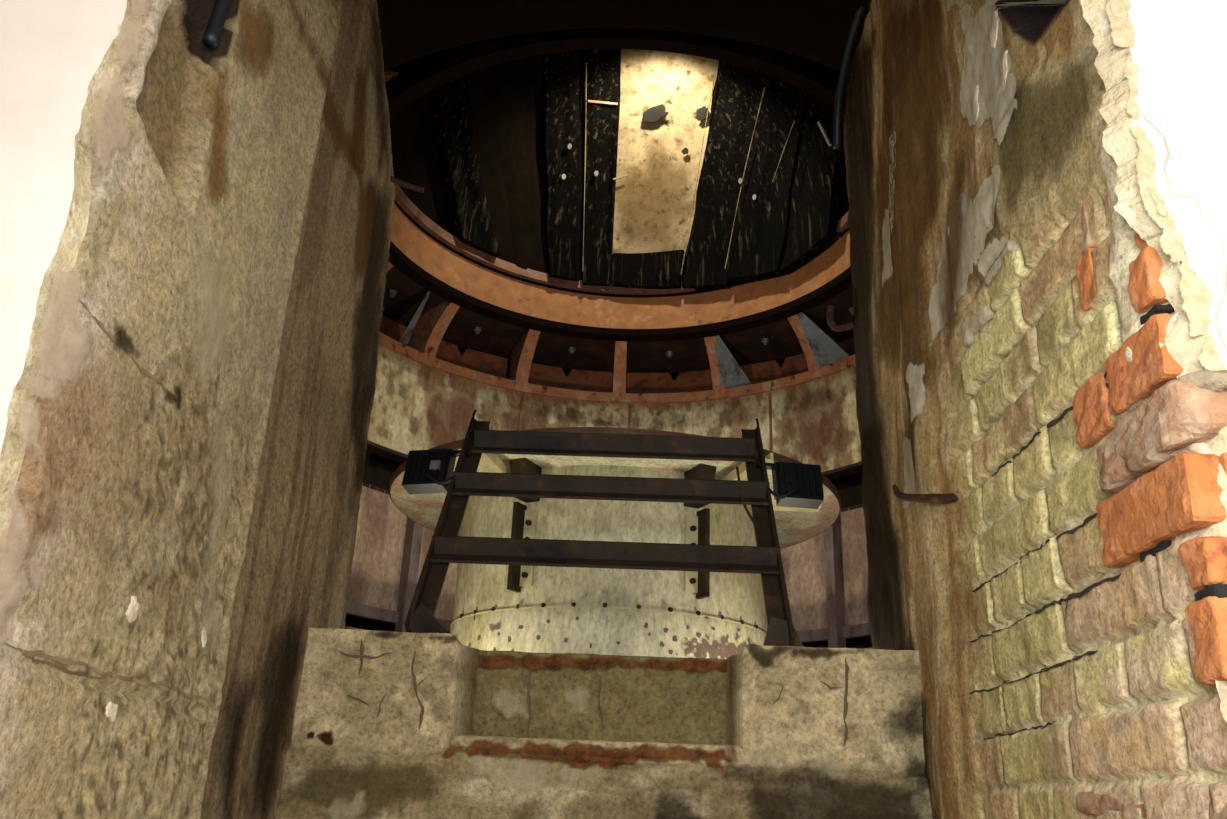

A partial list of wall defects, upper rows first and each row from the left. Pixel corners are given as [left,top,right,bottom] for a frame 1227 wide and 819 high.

peeling [946,0,1067,145]
leakage [210,89,225,201]
peeling [929,164,1021,349]
spalling [1071,0,1226,449]
crack [992,406,1073,476]
corrosion [468,615,751,673]
crack [969,650,1098,694]
crack [969,574,1121,642]
spalling [1096,451,1227,685]
corrosion [443,740,737,770]
leakage [656,794,698,819]
leakage [740,703,935,819]